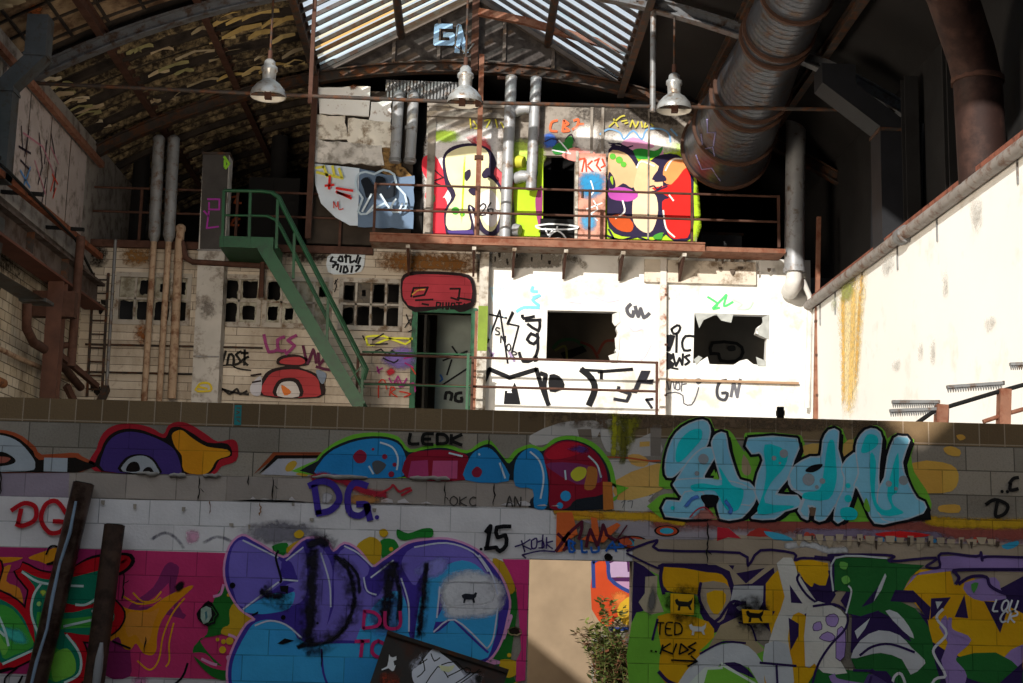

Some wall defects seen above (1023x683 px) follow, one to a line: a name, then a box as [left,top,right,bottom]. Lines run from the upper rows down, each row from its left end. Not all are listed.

peeling [608,312,620,360]
peeling [695,313,733,328]
peeling [757,315,769,339]
corrosion [838,276,865,410]